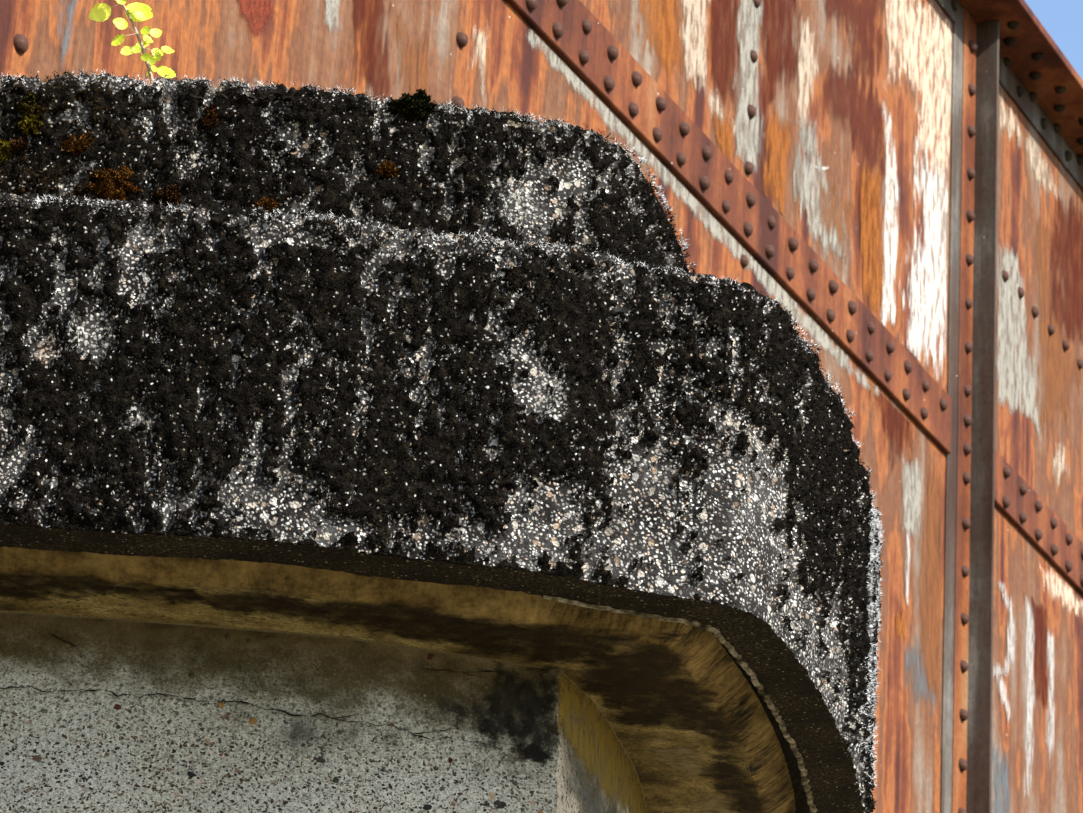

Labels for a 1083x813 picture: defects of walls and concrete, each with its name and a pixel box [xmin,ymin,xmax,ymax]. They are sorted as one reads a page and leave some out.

corrosion [638,0,683,82]
corrosion [715,116,733,160]
corrosion [711,0,741,100]
corrosion [762,0,799,215]
corrosion [820,0,886,309]
corrosion [1037,196,1083,435]
corrosion [869,386,912,468]
damp [0,570,771,813]
corrosion [918,472,943,695]
corrosion [1032,598,1048,707]